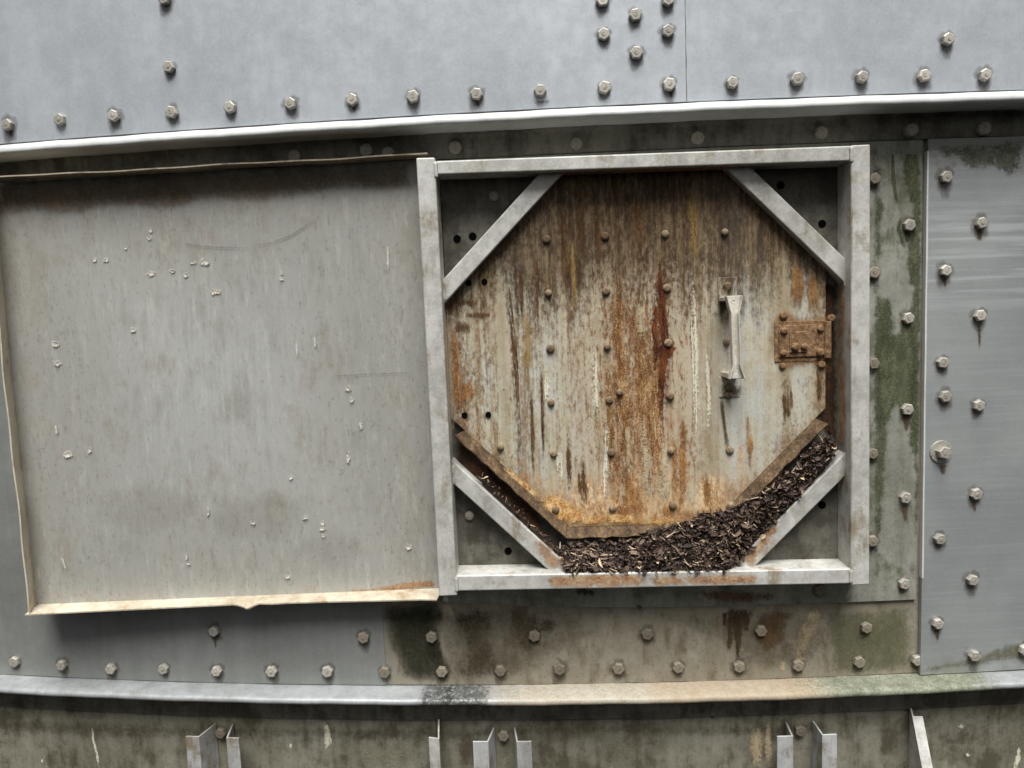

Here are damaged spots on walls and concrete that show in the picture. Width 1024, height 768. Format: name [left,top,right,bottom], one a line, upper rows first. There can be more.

corrosion [563,167,739,175]
water stain [943,143,1021,173]
water stain [897,221,916,243]
corrosion [447,299,490,413]
corrosion [506,264,545,471]
corrosion [603,261,689,518]
corrosion [773,266,845,445]
corrosion [458,443,787,656]
water stain [430,643,441,664]
water stain [496,611,826,706]
water stain [324,722,332,748]